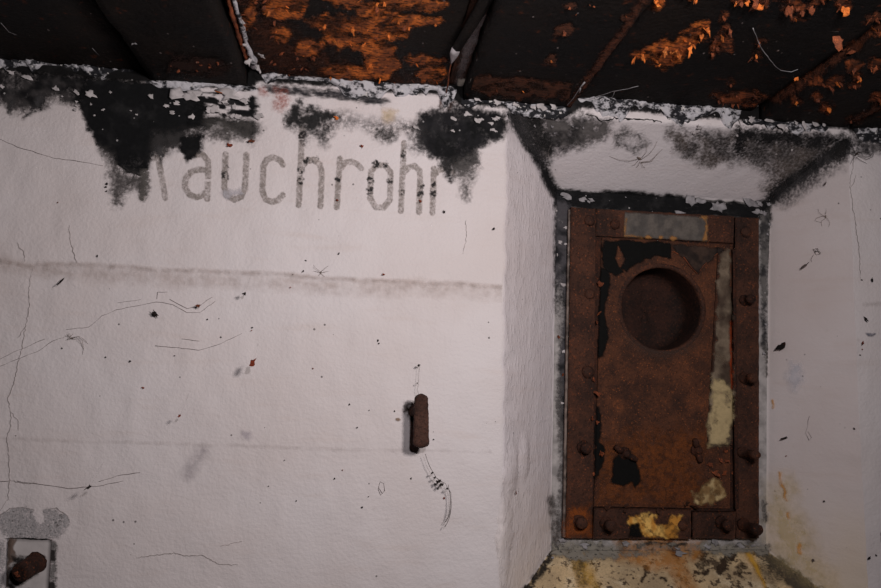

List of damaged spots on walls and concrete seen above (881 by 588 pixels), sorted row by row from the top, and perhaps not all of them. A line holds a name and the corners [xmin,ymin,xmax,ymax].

rust [227,0,456,85]
rust [631,0,769,70]
rust [711,11,881,115]
rust [781,0,852,22]
damp [140,169,149,201]
damp [180,134,204,161]
damp [766,138,852,204]
crack [2,244,33,508]